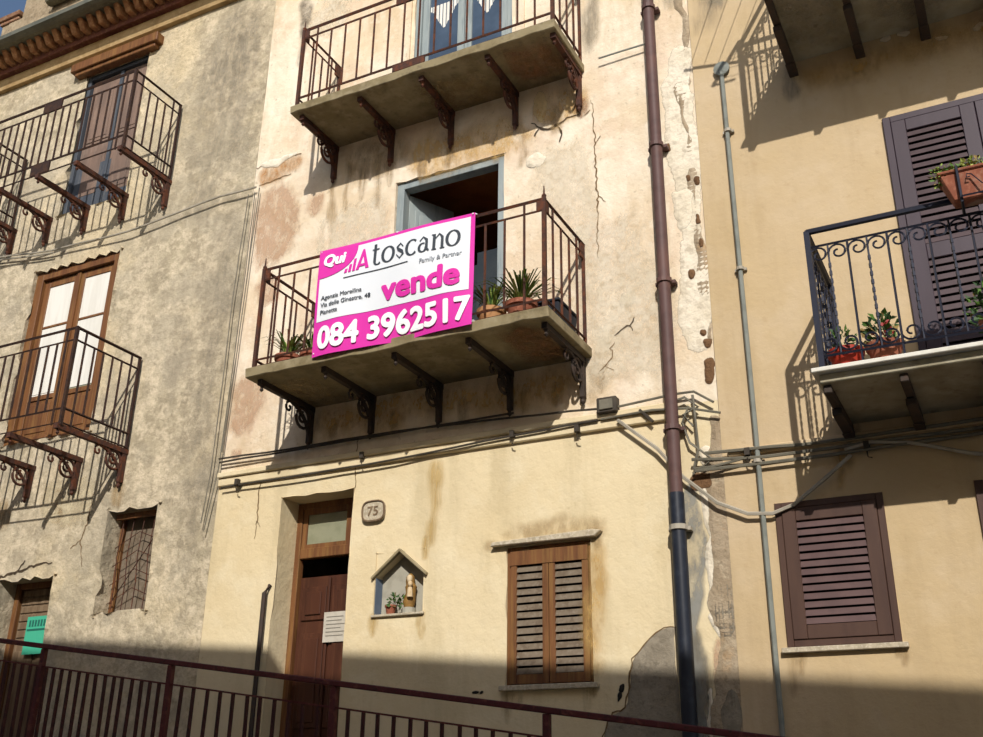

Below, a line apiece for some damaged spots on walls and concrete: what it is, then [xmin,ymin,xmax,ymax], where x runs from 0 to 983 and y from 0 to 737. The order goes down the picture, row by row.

crack [531,103,606,256]
flaking render [526,143,662,382]
flaking render [661,0,715,384]
crack [0,496,93,578]
water stain [424,464,441,555]
spalling [604,627,682,737]